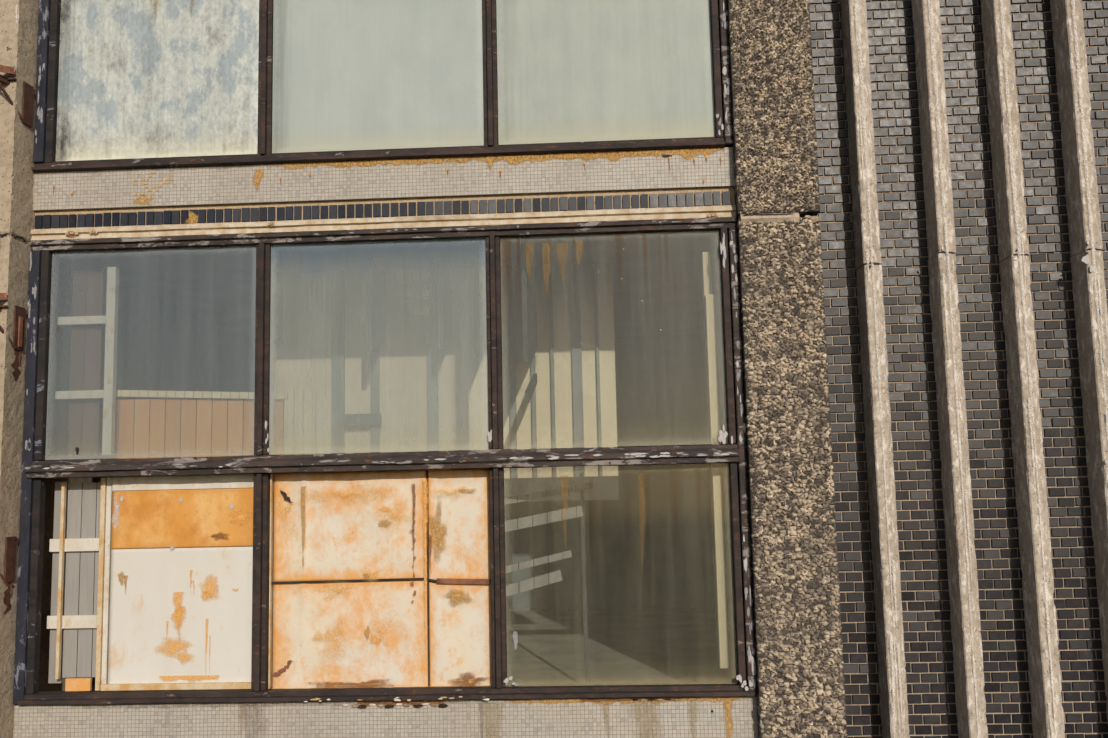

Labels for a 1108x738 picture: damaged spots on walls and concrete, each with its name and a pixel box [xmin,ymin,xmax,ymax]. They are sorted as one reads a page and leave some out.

peeling [624,341,746,458]
rust [3,582,15,614]
rust [272,469,492,688]
damp [724,699,733,738]